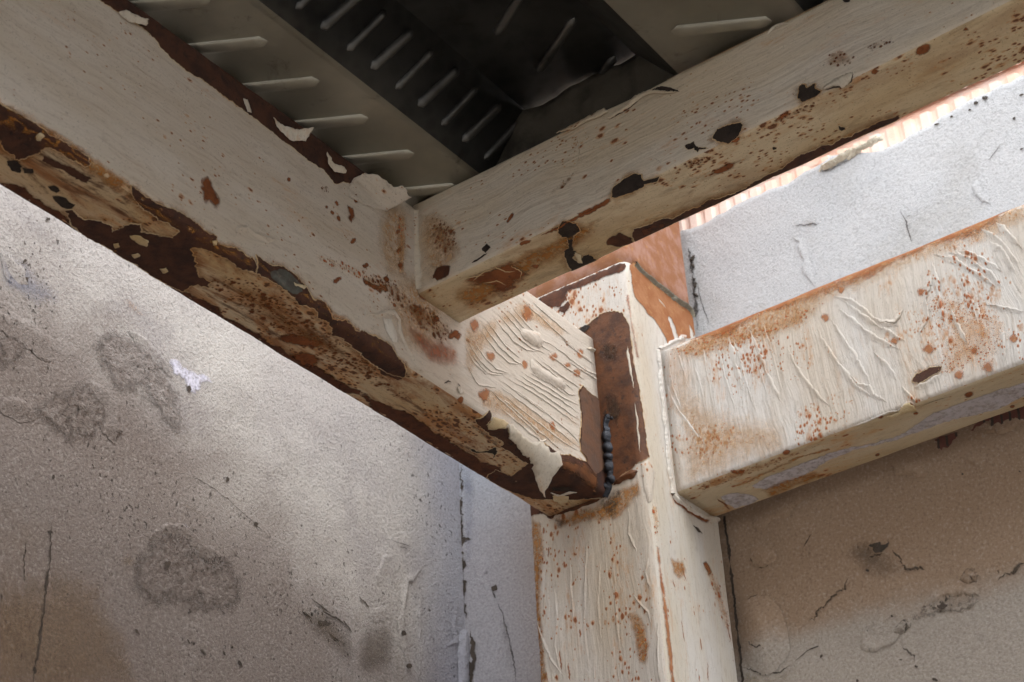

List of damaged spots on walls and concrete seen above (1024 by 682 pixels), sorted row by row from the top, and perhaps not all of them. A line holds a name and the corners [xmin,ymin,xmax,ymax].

peeling [48,185,407,380]
peeling [100,0,411,211]
peeling [470,310,650,504]
peeling [520,173,660,271]
corrosion [524,211,1006,355]
peeling [631,115,900,242]
corrosion [918,289,1017,379]
crack [21,524,65,682]
crack [459,465,476,682]
corrosion [530,484,638,682]
corrosion [658,551,686,682]
crack [998,563,1024,580]